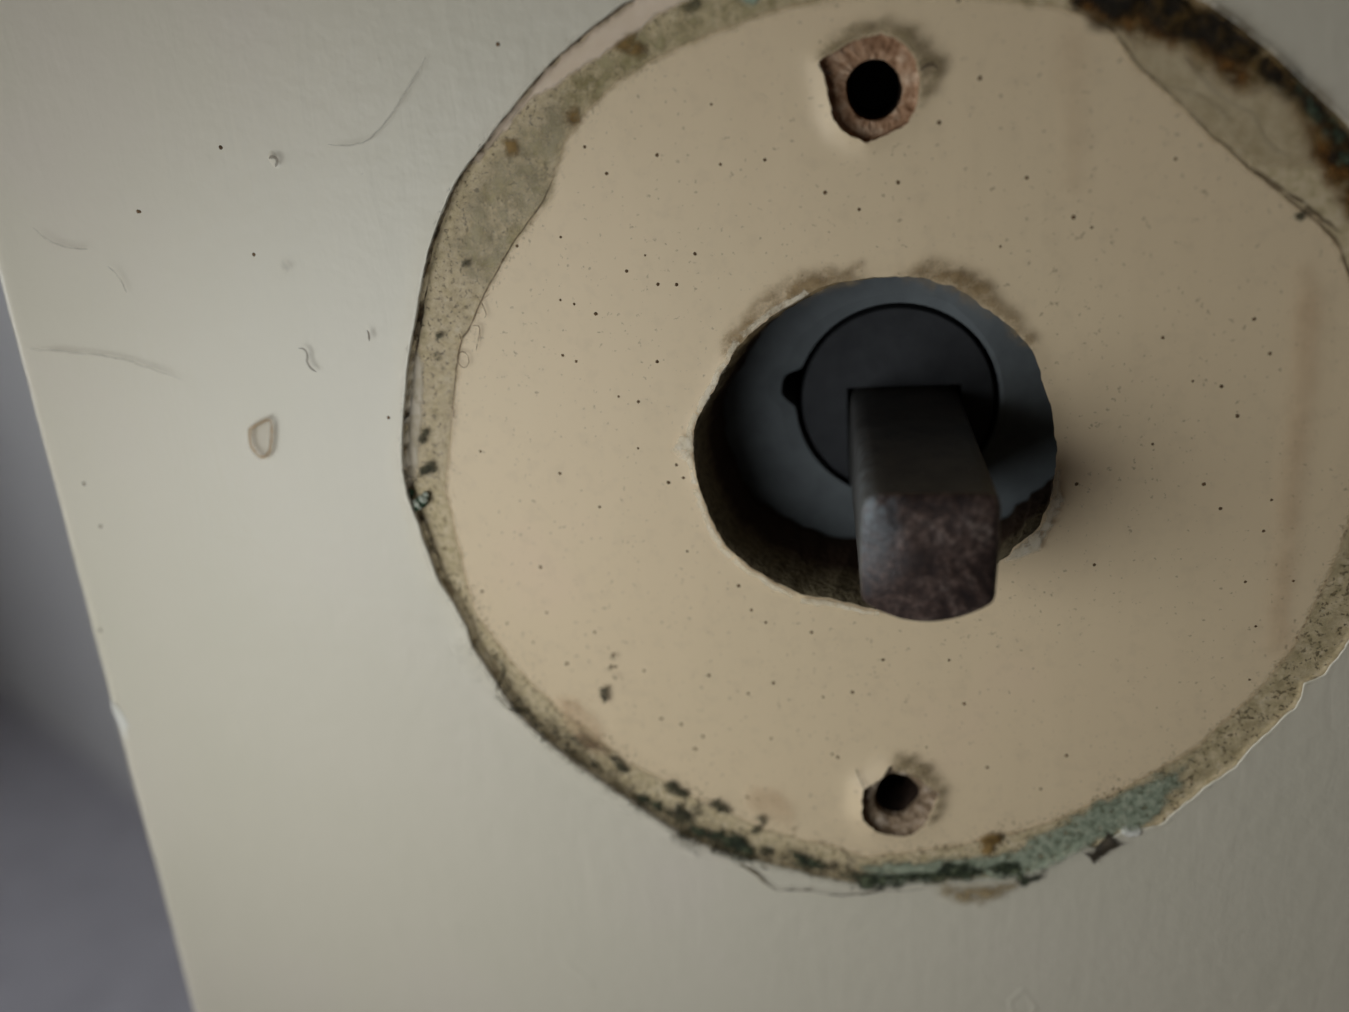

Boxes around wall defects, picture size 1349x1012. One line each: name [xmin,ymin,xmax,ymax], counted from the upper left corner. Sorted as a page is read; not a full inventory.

water stain [491,655,1182,891]